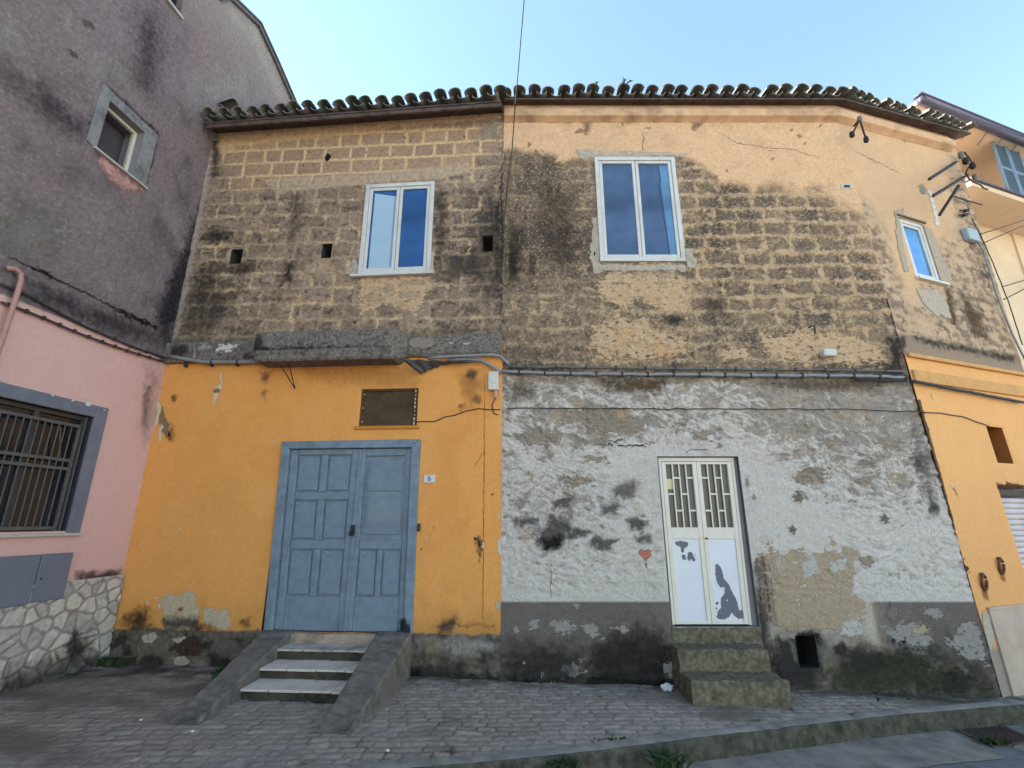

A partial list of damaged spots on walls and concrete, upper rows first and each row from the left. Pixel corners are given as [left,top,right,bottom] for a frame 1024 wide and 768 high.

leakage [494,206,534,291]
crack [2,253,158,330]
leakage [513,497,617,551]
leakage [604,480,635,514]
crack [590,438,655,448]
leakage [629,517,651,543]
peeling [918,394,958,538]
flaking render [754,536,878,638]
peeling [141,590,231,666]
peeling [513,602,629,640]
peeling [879,603,995,668]
leakage [587,676,664,686]